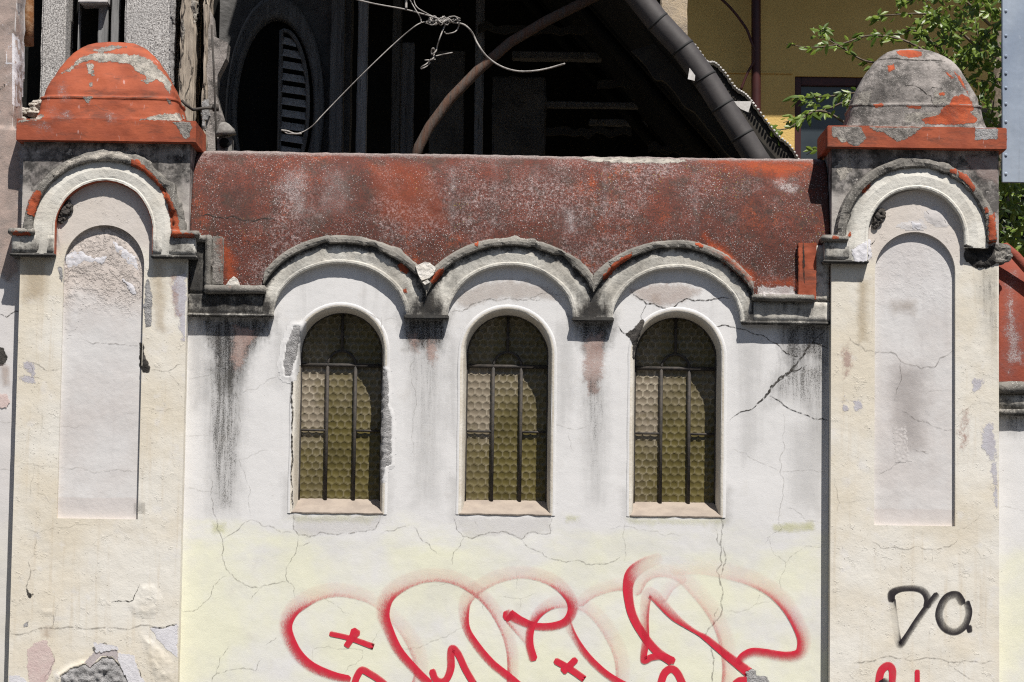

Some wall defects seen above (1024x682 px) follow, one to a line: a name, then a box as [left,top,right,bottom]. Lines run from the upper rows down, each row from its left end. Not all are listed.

peeling [61,0,210,139]
peeling [888,50,922,72]
peeling [832,72,998,180]
peeling [603,252,632,280]
crack [633,294,728,313]
water stain [195,257,270,509]
spalling [277,318,306,508]
spalling [380,366,397,484]
water stain [571,287,614,475]
crack [716,324,827,420]
peeling [981,423,998,507]
spalling [9,640,145,682]